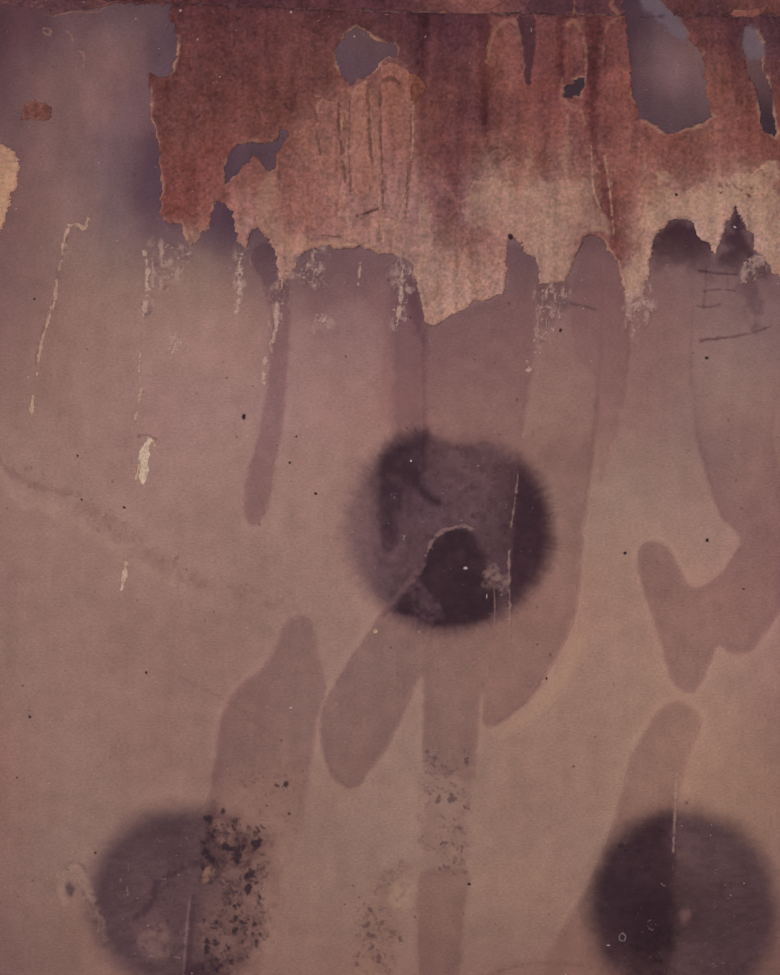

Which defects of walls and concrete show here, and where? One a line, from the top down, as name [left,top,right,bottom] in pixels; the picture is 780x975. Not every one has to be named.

peeling [730,7,765,18]
damp [201,243,593,975]
damp [557,442,780,950]